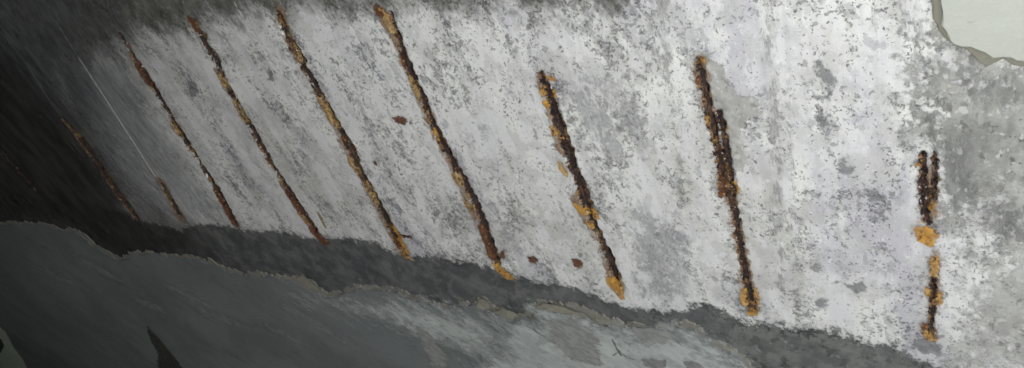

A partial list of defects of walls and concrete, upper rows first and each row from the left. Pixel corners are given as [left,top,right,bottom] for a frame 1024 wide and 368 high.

corrosion [187,16,206,37]
flaking render [931,0,1024,68]
corrosion [123,40,240,228]
corrosion [213,69,332,246]
corrosion [275,6,415,261]
flaking render [0,220,755,368]
corrosion [373,5,515,281]
corrosion [537,71,625,300]
corrosion [693,56,761,316]
spalling [917,151,940,226]
corrosion [914,151,943,342]
spalling [927,278,937,333]